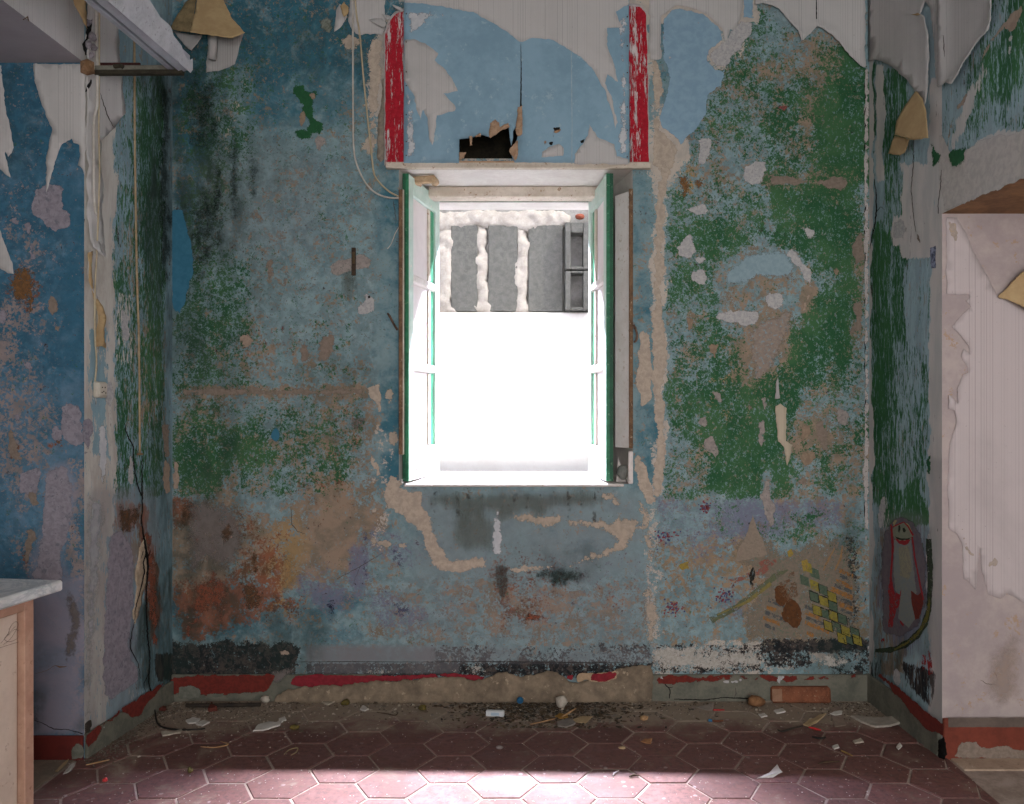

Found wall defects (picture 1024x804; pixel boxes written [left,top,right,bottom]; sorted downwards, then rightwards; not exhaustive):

leakage [192,148,239,282]
crack [125,425,151,692]
leakage [496,566,507,597]
leakage [538,569,581,586]
peeling [291,665,486,687]
peeling [567,671,617,683]